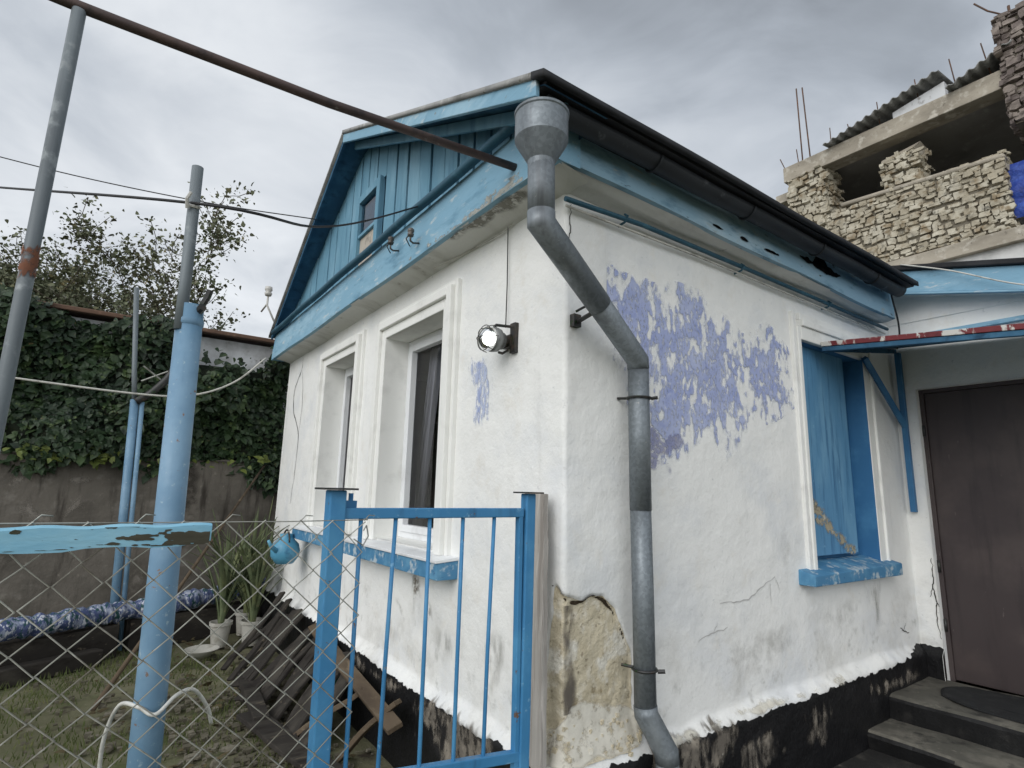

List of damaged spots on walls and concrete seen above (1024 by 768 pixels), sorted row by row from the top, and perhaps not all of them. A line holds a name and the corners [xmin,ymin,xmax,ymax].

peeling [471,362,489,422]
peeling [607,265,794,468]
crack [699,578,780,641]
crack [930,560,941,638]
flaking render [546,585,656,768]
peeling [674,716,738,768]